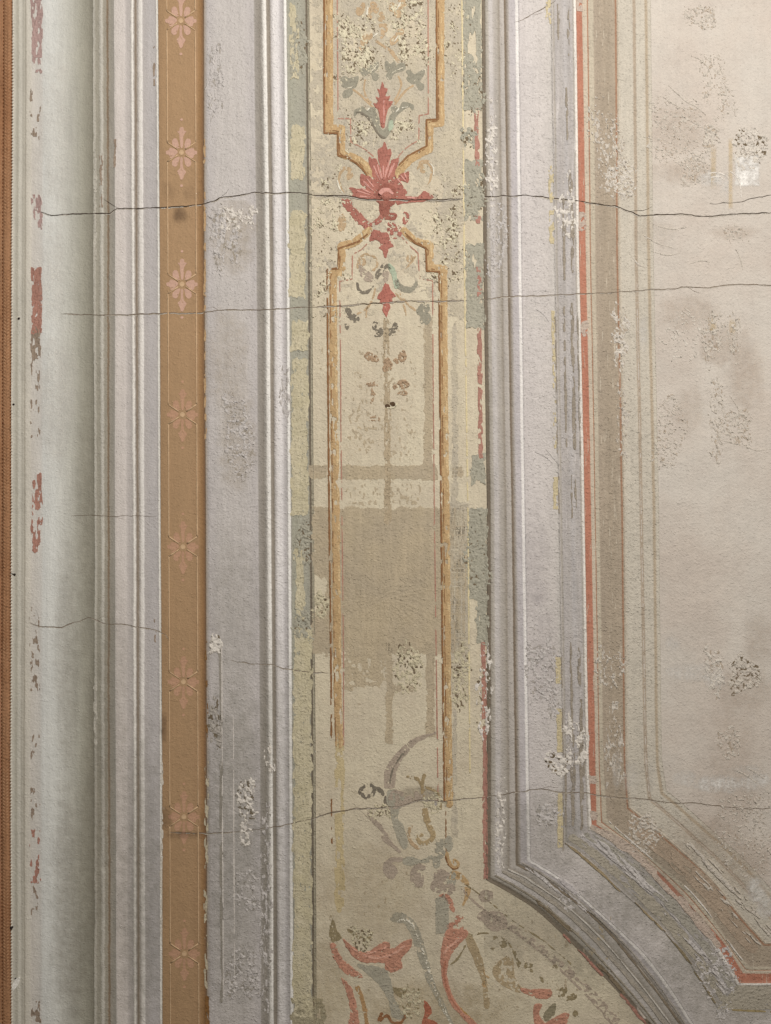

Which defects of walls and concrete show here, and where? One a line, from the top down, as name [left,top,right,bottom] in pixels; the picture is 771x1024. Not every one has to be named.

crack [39,192,768,218]
crack [64,284,771,316]
peeling [30,267,43,438]
peeling [30,472,43,553]
crack [31,616,168,638]
crack [176,787,768,835]